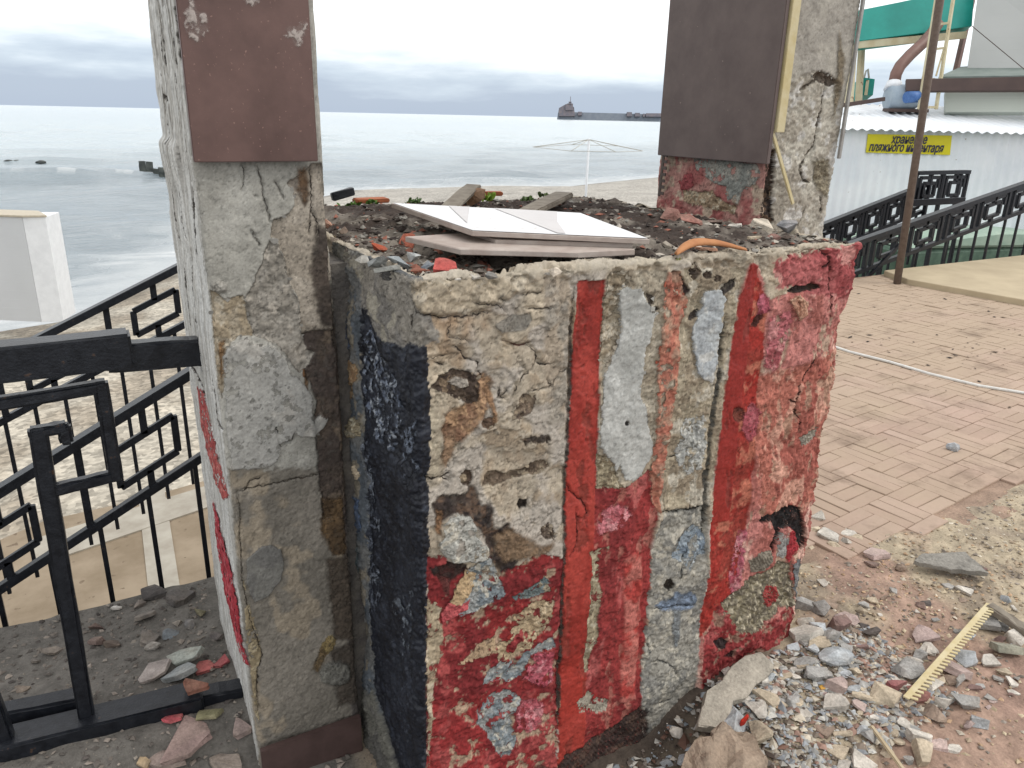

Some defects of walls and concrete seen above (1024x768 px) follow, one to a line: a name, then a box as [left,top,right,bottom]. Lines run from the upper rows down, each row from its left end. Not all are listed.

crack [242,167,284,245]
crack [308,173,318,235]
flaking render [678,150,775,223]
crack [798,79,823,224]
flaking render [197,163,334,720]
flaking render [431,369,481,404]
flaking render [482,417,495,429]
flaking render [482,460,549,486]
flaking render [512,392,536,420]
crack [788,354,816,424]
flaking render [540,523,558,539]
flaking render [721,505,805,634]